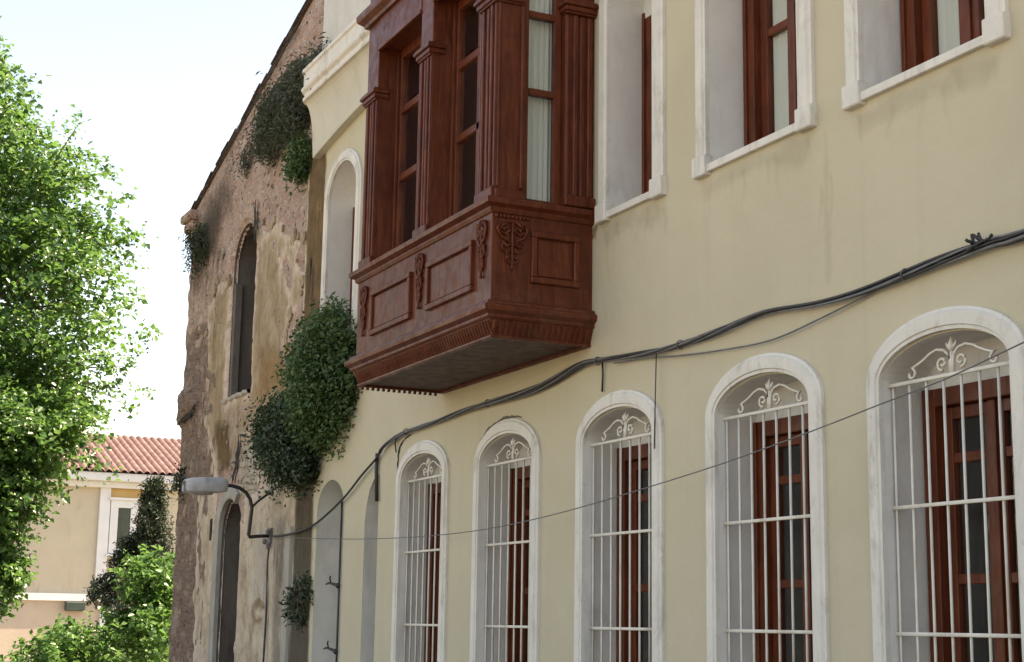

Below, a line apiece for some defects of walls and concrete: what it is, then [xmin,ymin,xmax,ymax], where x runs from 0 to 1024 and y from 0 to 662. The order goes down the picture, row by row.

flaking render [168,0,324,662]